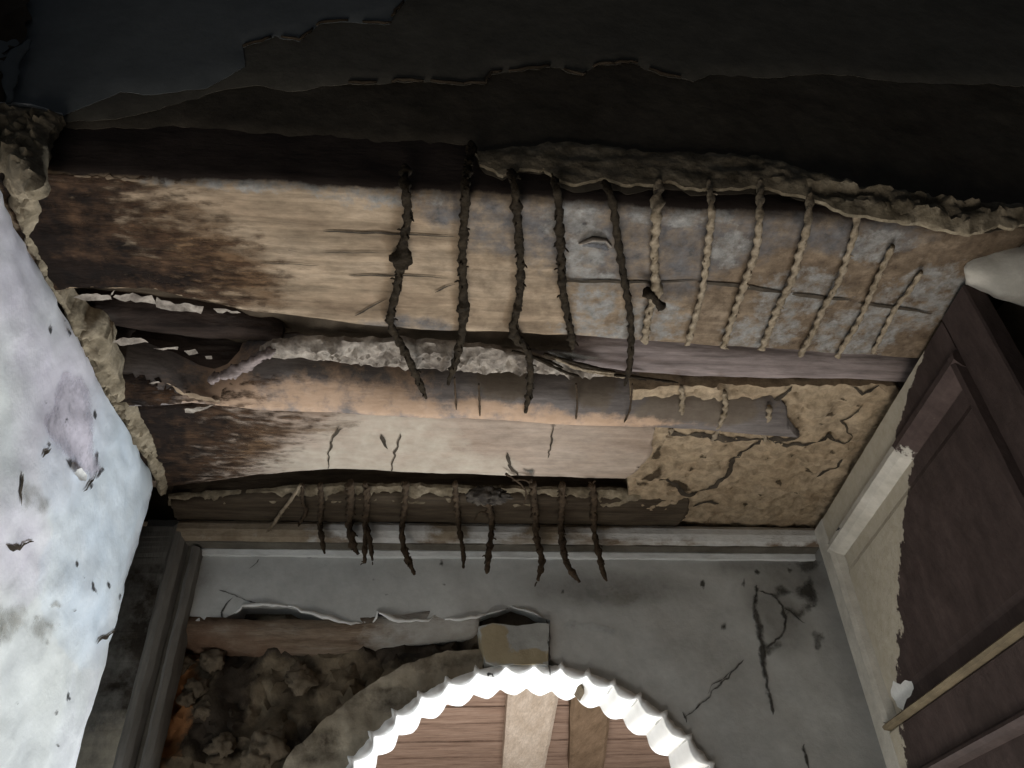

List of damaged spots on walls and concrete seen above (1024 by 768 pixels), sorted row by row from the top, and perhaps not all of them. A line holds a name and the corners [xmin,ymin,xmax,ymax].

water stain [0,173,292,313]
spalling [0,0,1024,496]
crack [661,385,886,507]
spalling [159,602,543,768]
spalling [574,684,584,701]
crack [683,585,802,723]
peeling [891,680,914,710]